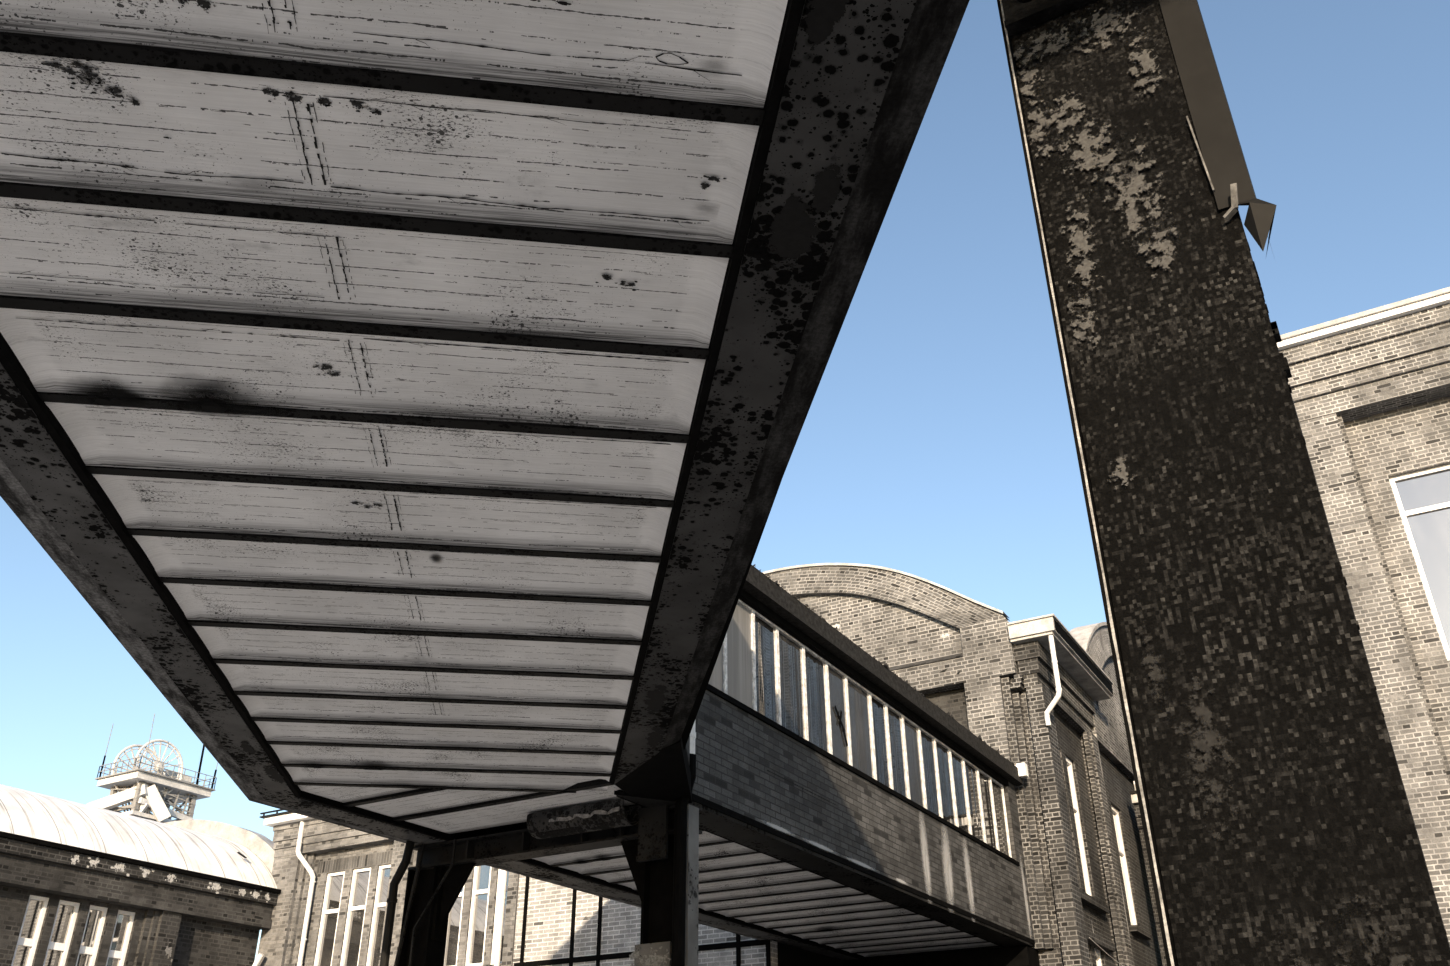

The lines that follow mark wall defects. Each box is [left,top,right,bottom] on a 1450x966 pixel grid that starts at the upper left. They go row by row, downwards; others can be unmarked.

rust [804,0,850,51]
leakage [93,388,144,406]
leakage [197,400,280,414]